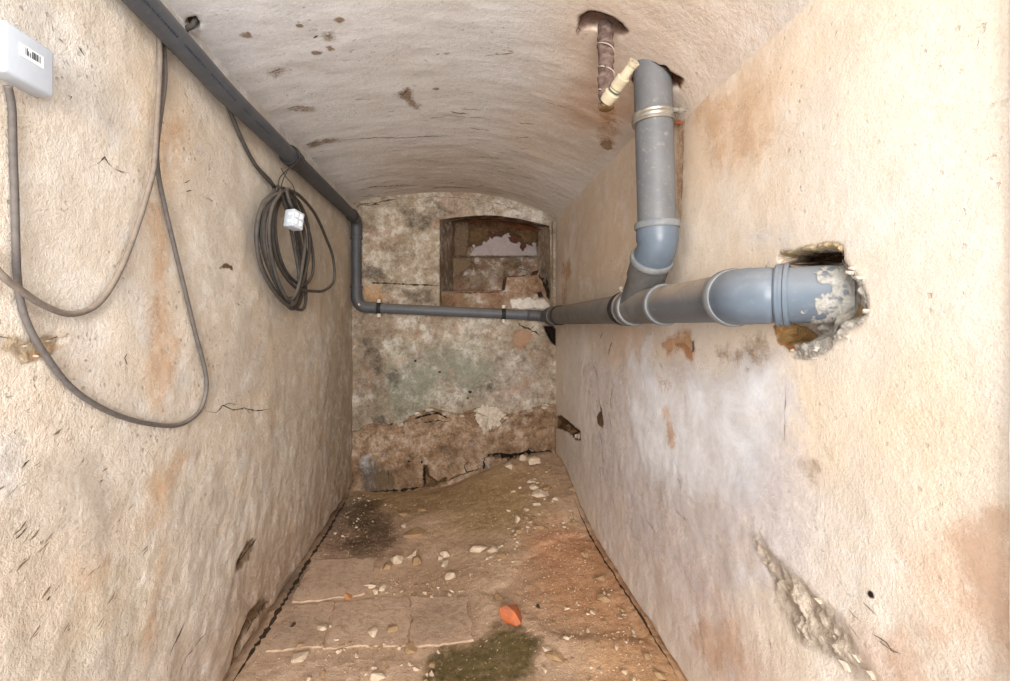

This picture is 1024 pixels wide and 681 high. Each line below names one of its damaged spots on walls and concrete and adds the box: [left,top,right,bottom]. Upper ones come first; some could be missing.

flaking render [451,220,541,257]
flaking render [510,291,550,309]
spalling [774,242,871,360]
crack [205,403,267,413]
flaking render [349,391,581,492]
flaking render [755,538,876,680]